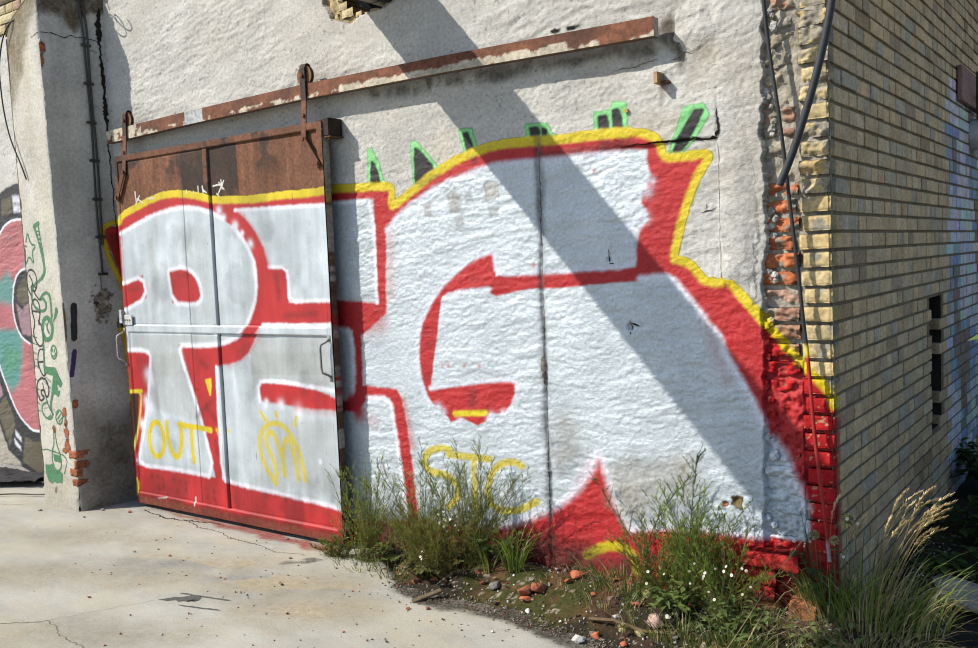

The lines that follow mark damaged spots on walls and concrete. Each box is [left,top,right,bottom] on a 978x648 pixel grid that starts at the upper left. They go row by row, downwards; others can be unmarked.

spalling [331,0,389,21]
crack [34,8,119,250]
crack [621,108,721,268]
spalling [748,0,843,556]
spalling [53,400,91,497]
crack [2,618,84,647]